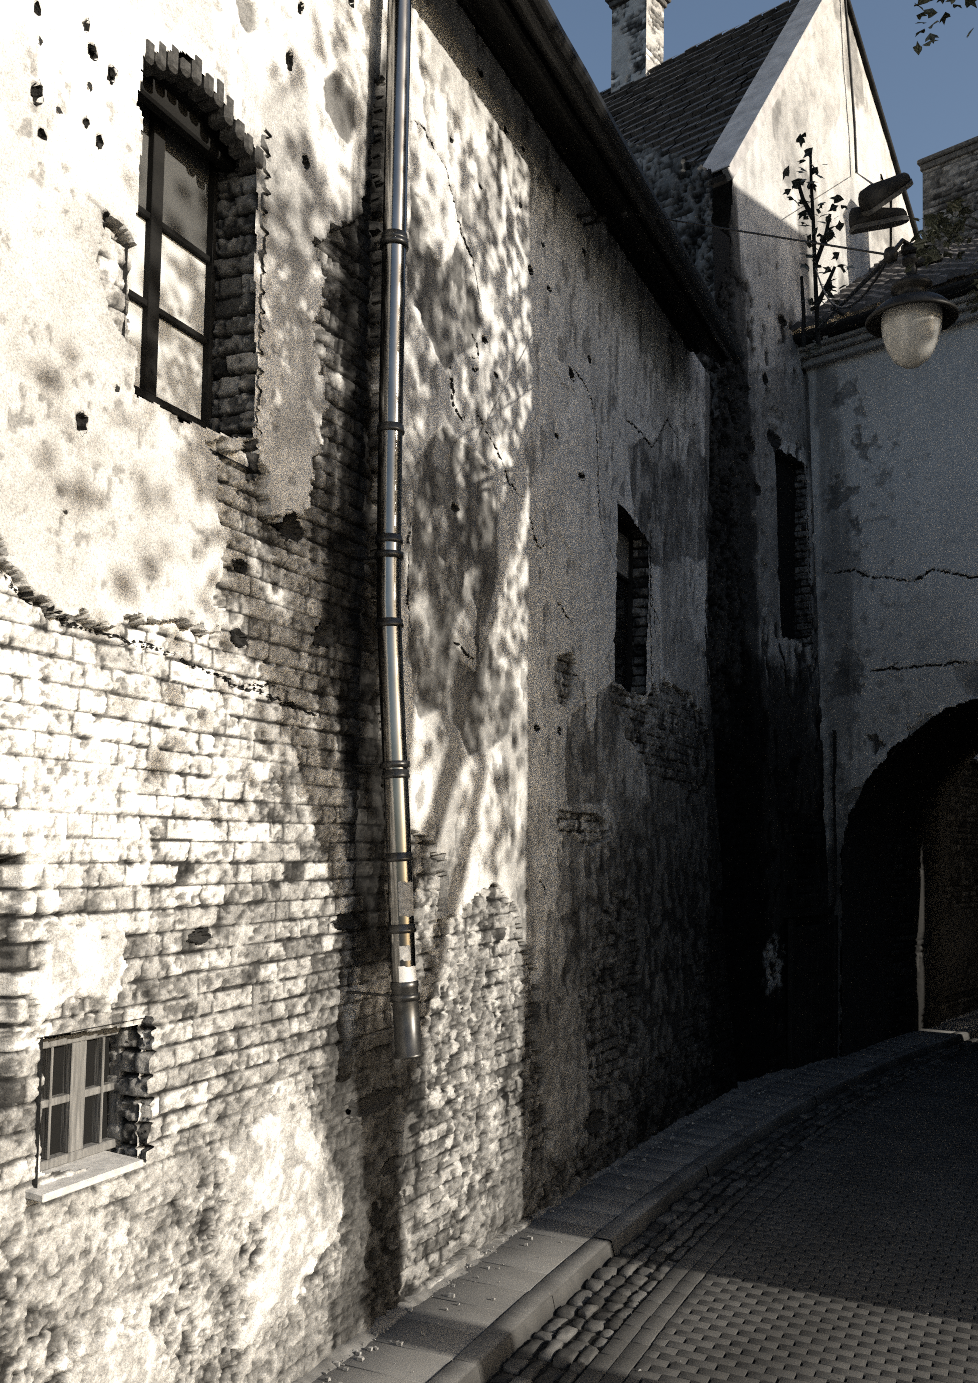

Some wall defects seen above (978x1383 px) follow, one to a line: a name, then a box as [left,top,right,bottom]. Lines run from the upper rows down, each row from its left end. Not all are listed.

leakage [728,184,753,374]
spalling [0,69,807,1383]
leakage [425,0,723,1166]
peeling [826,644,866,702]
crack [824,569,978,582]
crack [870,660,970,672]